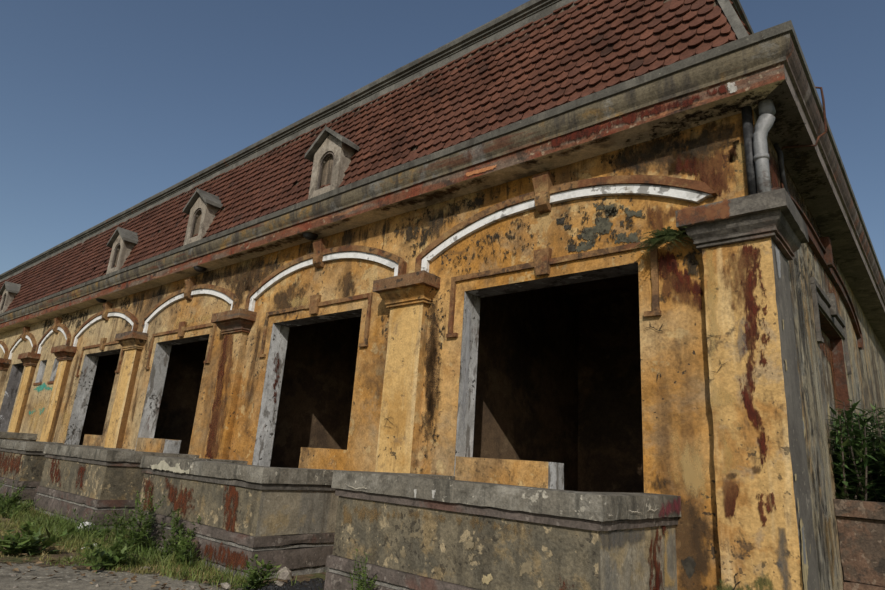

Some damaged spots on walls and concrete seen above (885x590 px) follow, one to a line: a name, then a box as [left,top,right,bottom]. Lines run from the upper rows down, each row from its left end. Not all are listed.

leakage [525,137,608,164]
leakage [602,82,832,239]
spalling [556,202,643,252]
rust [658,251,703,311]
leakage [791,244,814,375]
leakage [426,294,446,451]
rust [723,244,770,466]
rust [223,485,238,532]
rust [723,480,739,518]
rust [756,492,776,526]
rust [204,542,248,574]
rust [647,526,668,590]